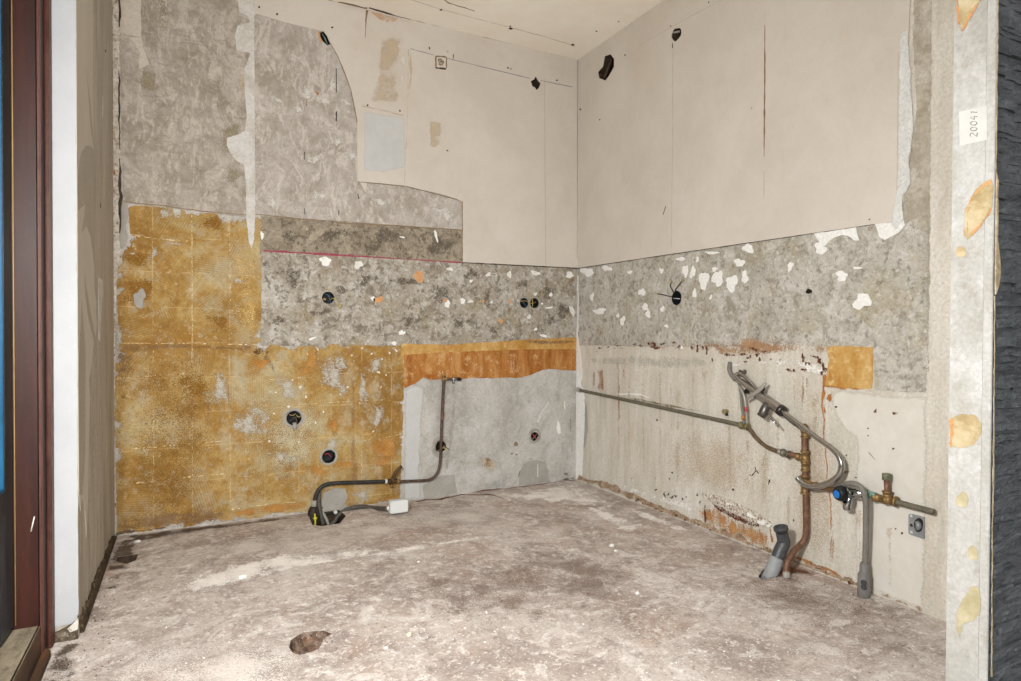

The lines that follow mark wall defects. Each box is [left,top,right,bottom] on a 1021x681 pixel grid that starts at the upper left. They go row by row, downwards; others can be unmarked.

peeling [133,288,146,309]
spalling [322,288,342,309]
peeling [214,371,231,404]
peeling [307,330,406,433]
peeling [232,374,347,489]
corrosion [793,374,832,479]
spalling [318,510,345,526]
spalling [577,475,773,553]
spalling [785,557,857,586]